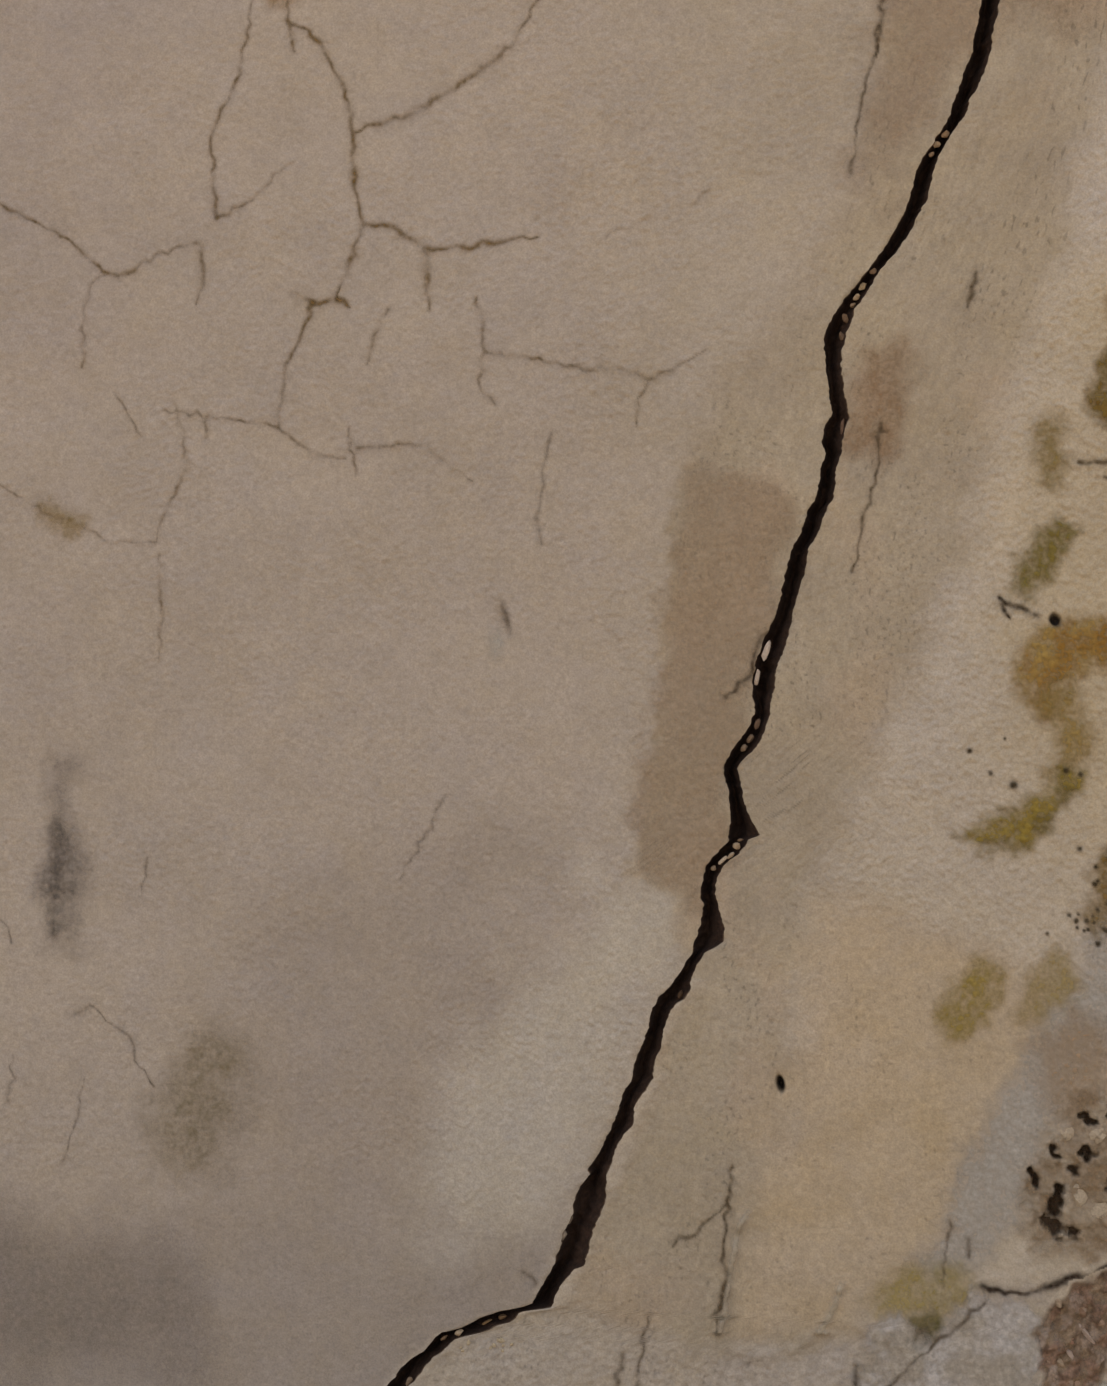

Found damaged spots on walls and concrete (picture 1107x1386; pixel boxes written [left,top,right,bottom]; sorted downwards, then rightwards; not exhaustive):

crack [291,27,538,282]
crack [2,205,135,274]
crack [290,257,352,357]
leakage [1087,354,1107,421]
leakage [1019,521,1076,589]
crack [387,0,1000,1386]
leakage [967,618,1107,850]
spalling [1025,1095,1107,1258]